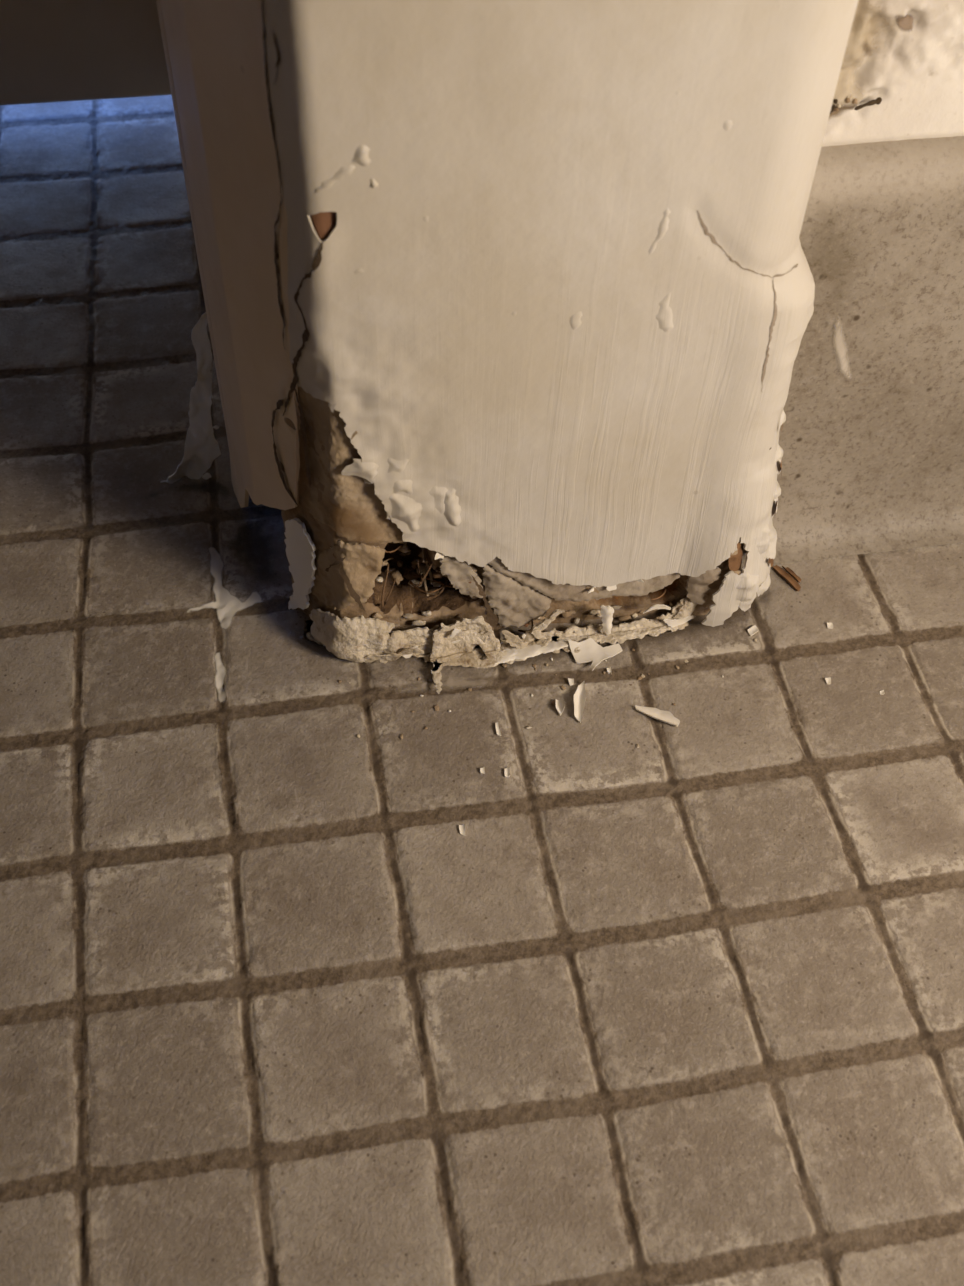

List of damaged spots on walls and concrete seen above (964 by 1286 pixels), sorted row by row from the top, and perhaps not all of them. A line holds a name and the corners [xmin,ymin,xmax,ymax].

flaking render [829,0,914,117]
crack [261,0,323,507]
peeling [311,212,337,240]
crack [697,210,798,391]
spalling [284,386,787,694]